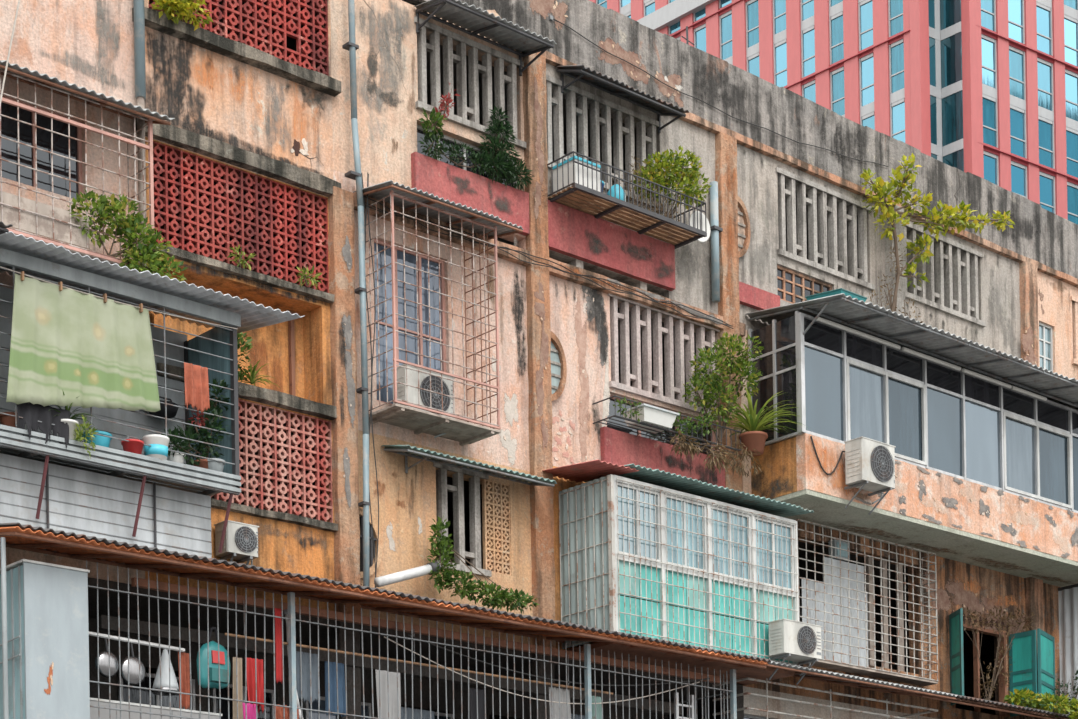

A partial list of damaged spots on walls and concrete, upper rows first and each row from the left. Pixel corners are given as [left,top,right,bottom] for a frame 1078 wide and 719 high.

water stain [42,0,124,86]
water stain [144,32,324,174]
water stain [664,65,750,126]
water stain [821,116,865,167]
water stain [988,192,1040,241]
peeling [917,466,1004,528]
peeling [981,496,1041,550]
peeling [1061,509,1078,558]